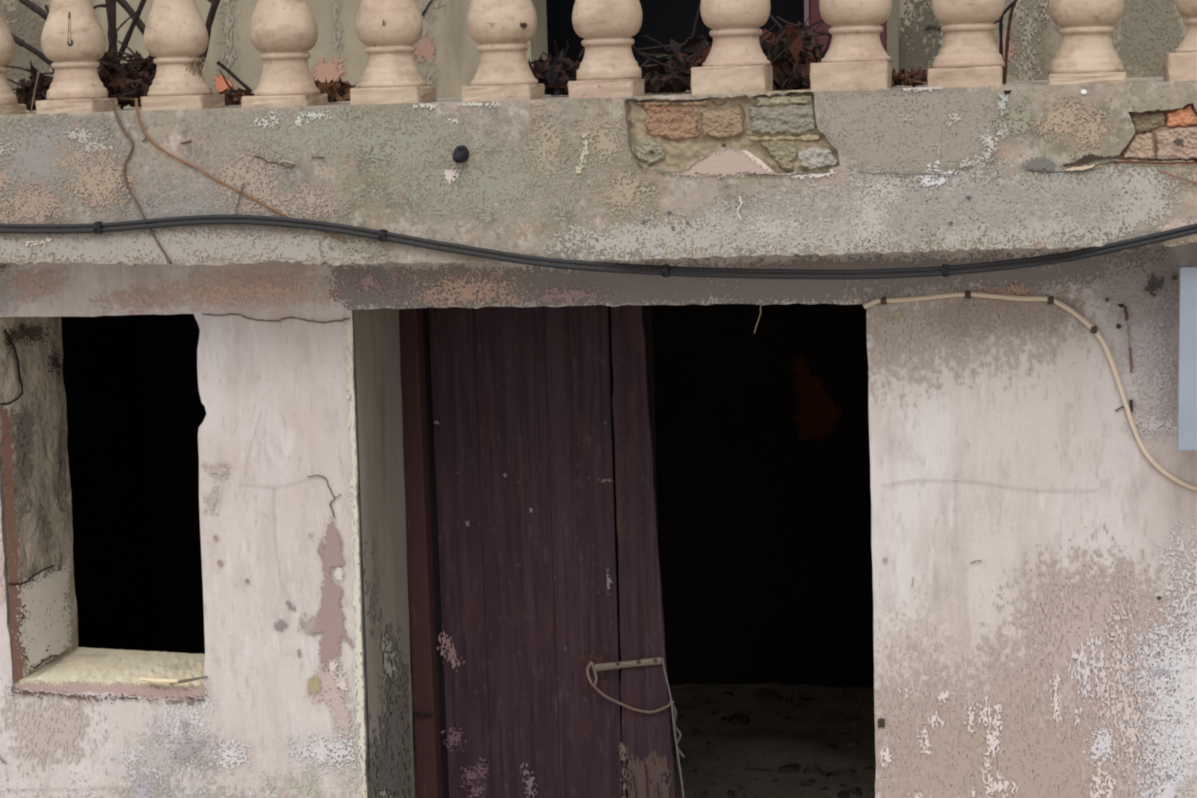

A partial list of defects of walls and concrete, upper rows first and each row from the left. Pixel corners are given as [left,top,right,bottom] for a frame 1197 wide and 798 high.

spalling [627,90,840,179]
flaking render [1060,103,1197,171]
crack [202,313,350,324]
crack [307,475,342,518]
peeling [273,319,367,798]
water stain [0,536,413,798]
peeling [874,522,1197,798]